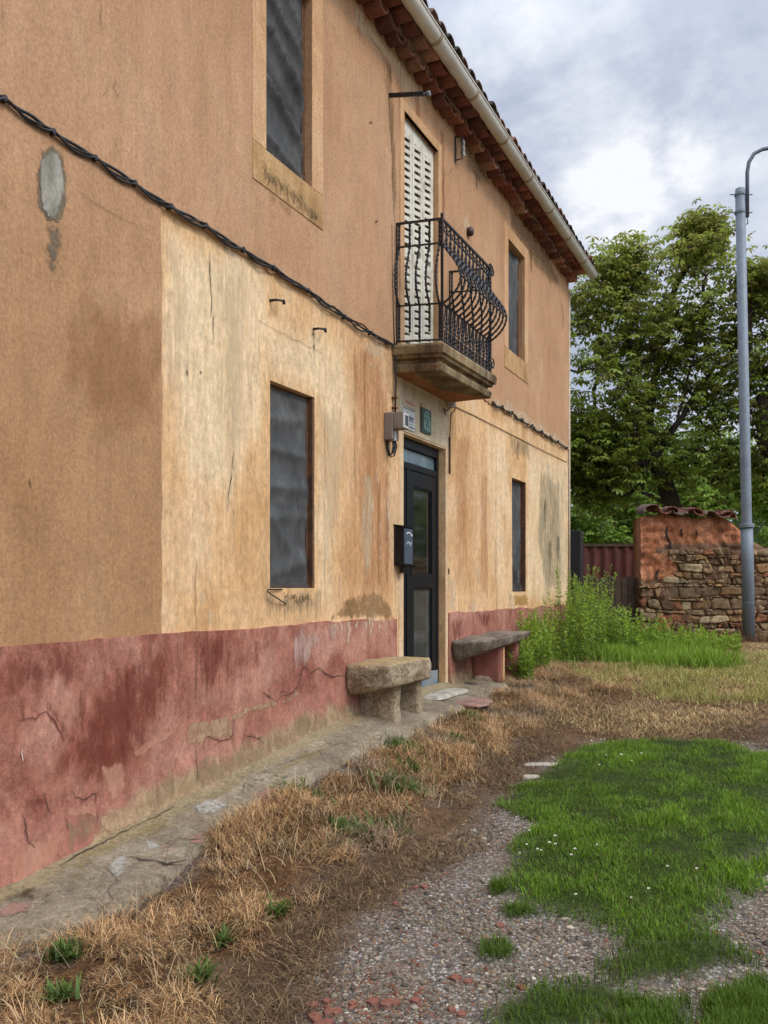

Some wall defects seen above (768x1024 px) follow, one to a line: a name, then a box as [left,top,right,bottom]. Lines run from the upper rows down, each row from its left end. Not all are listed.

spalling [37,145,67,272]
leakage [331,593,392,619]
crack [265,666,346,700]
crack [20,704,64,741]
spalling [135,691,298,756]
crack [23,792,98,848]